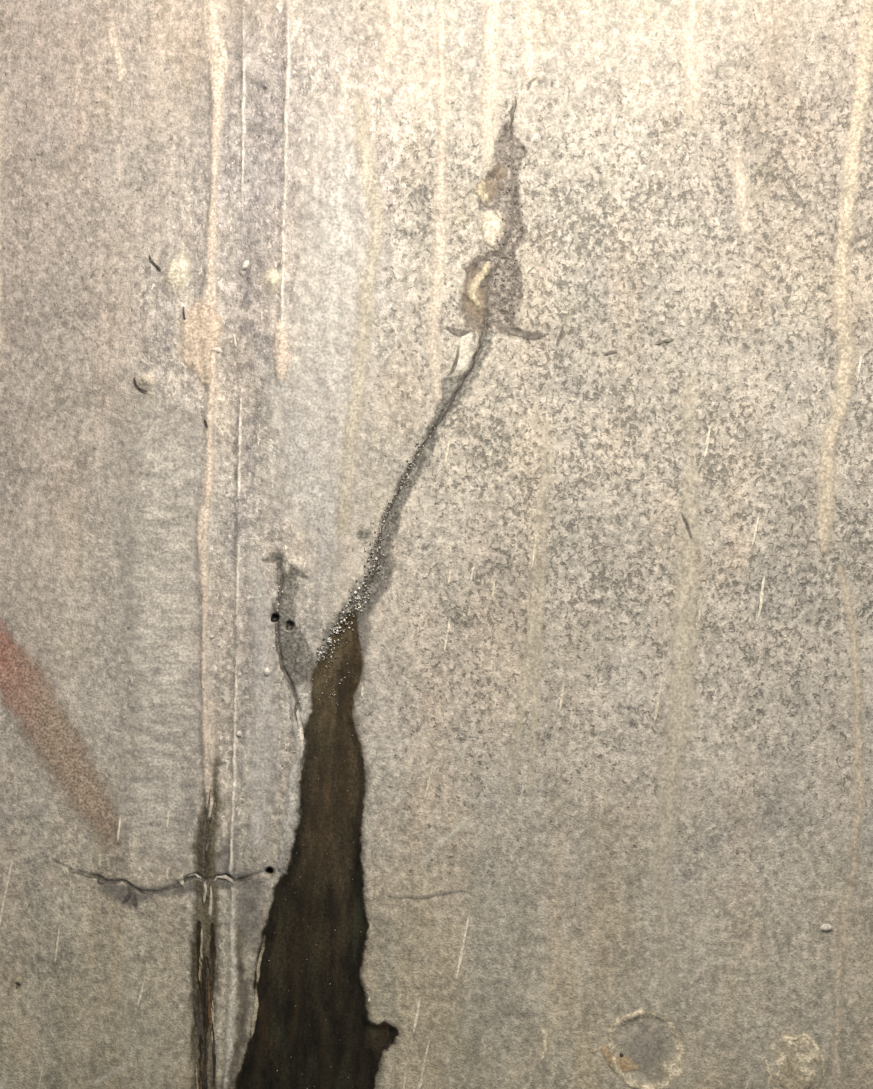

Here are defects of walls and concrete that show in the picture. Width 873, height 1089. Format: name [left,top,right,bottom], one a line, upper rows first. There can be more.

damp [181,0,399,1089]
crack [69,77,562,915]